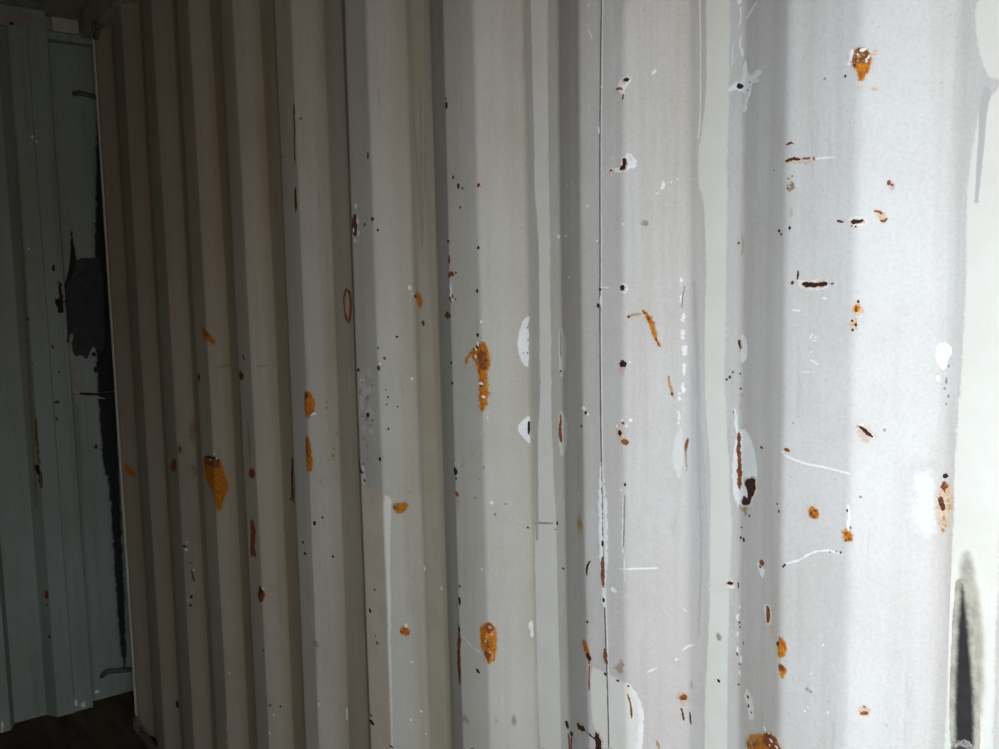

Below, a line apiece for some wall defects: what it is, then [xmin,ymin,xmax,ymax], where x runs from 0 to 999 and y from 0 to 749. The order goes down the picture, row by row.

rust [844,44,880,93]
peeling [517,316,530,367]
rust [626,308,662,348]
rust [303,388,329,420]
rust [451,320,494,419]
rust [666,374,676,399]
rust [203,453,231,514]
peeling [901,461,955,547]
rust [478,620,500,667]
peeling [575,666,645,749]
rust [744,726,787,749]